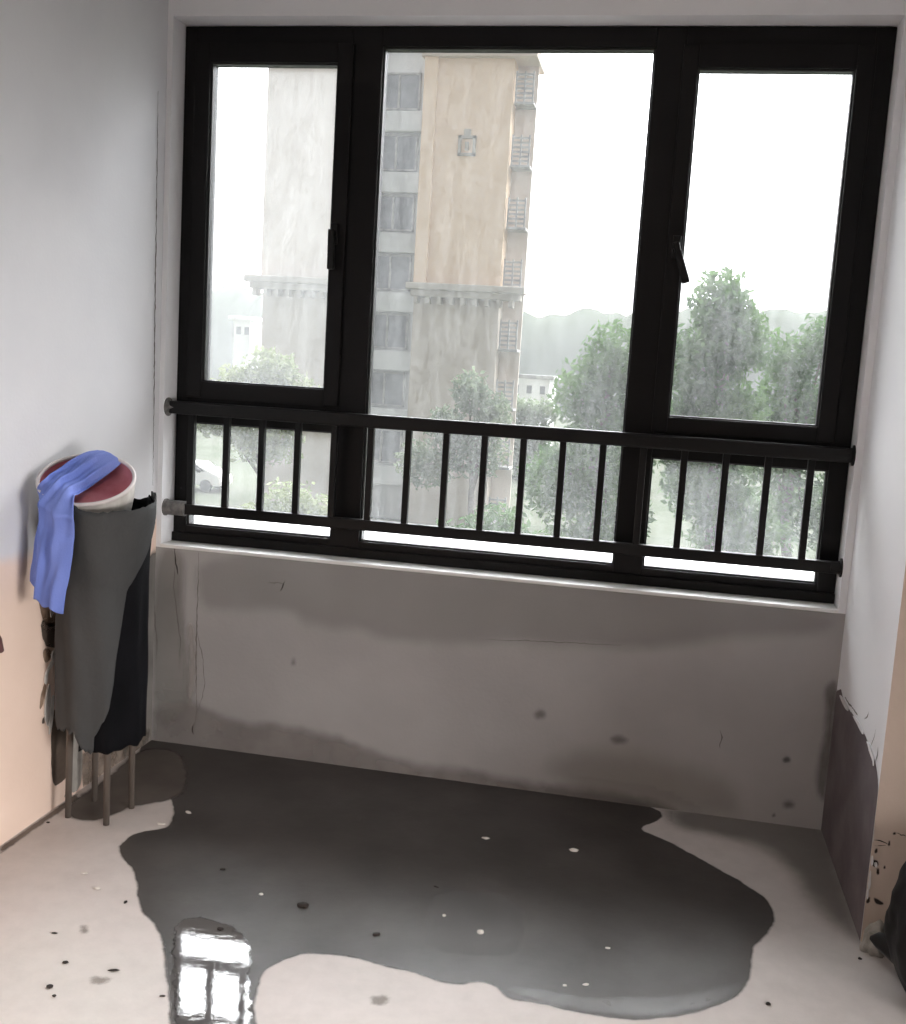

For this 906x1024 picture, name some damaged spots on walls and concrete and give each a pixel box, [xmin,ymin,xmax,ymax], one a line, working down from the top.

crack [154,549,205,733]
water stain [71,552,774,1024]
flaking render [821,689,905,940]